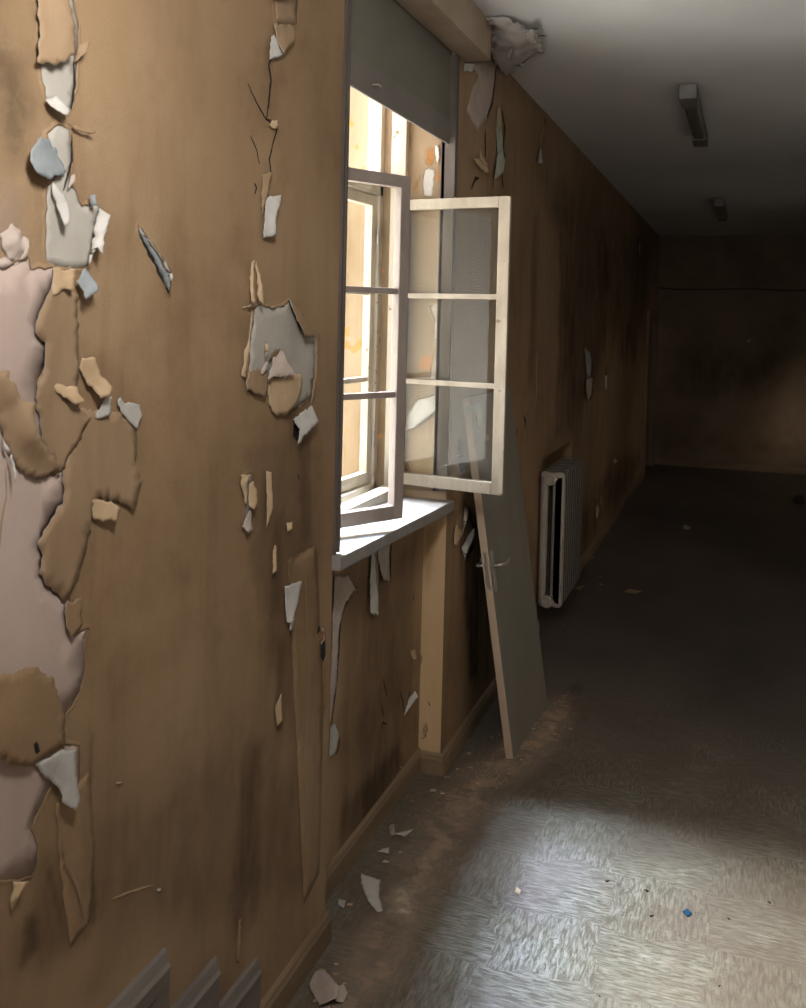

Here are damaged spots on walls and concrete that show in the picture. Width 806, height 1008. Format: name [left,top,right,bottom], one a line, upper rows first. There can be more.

peeling [269,0,300,60]
peeling [464,60,506,189]
peeling [135,219,174,297]
peeling [241,259,319,444]
peeling [0,0,143,912]
peeling [284,581,302,631]
peeling [369,544,392,615]
peeling [317,572,357,758]
peeling [275,695,283,726]